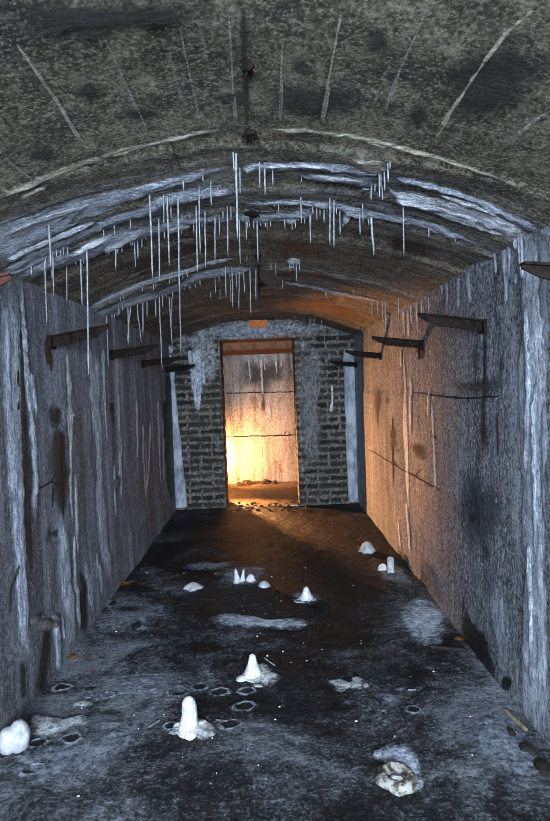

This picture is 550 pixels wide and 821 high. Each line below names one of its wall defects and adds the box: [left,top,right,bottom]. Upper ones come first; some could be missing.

water stain [264,165,364,184]
water stain [4,204,89,235]
water stain [397,196,496,223]
water stain [8,223,94,262]
water stain [65,233,141,259]
water stain [136,245,209,269]
water stain [124,295,160,308]
water stain [440,272,471,309]
water stain [402,298,429,337]
water stain [188,349,205,410]
crack [414,392,502,403]
crack [369,417,440,490]